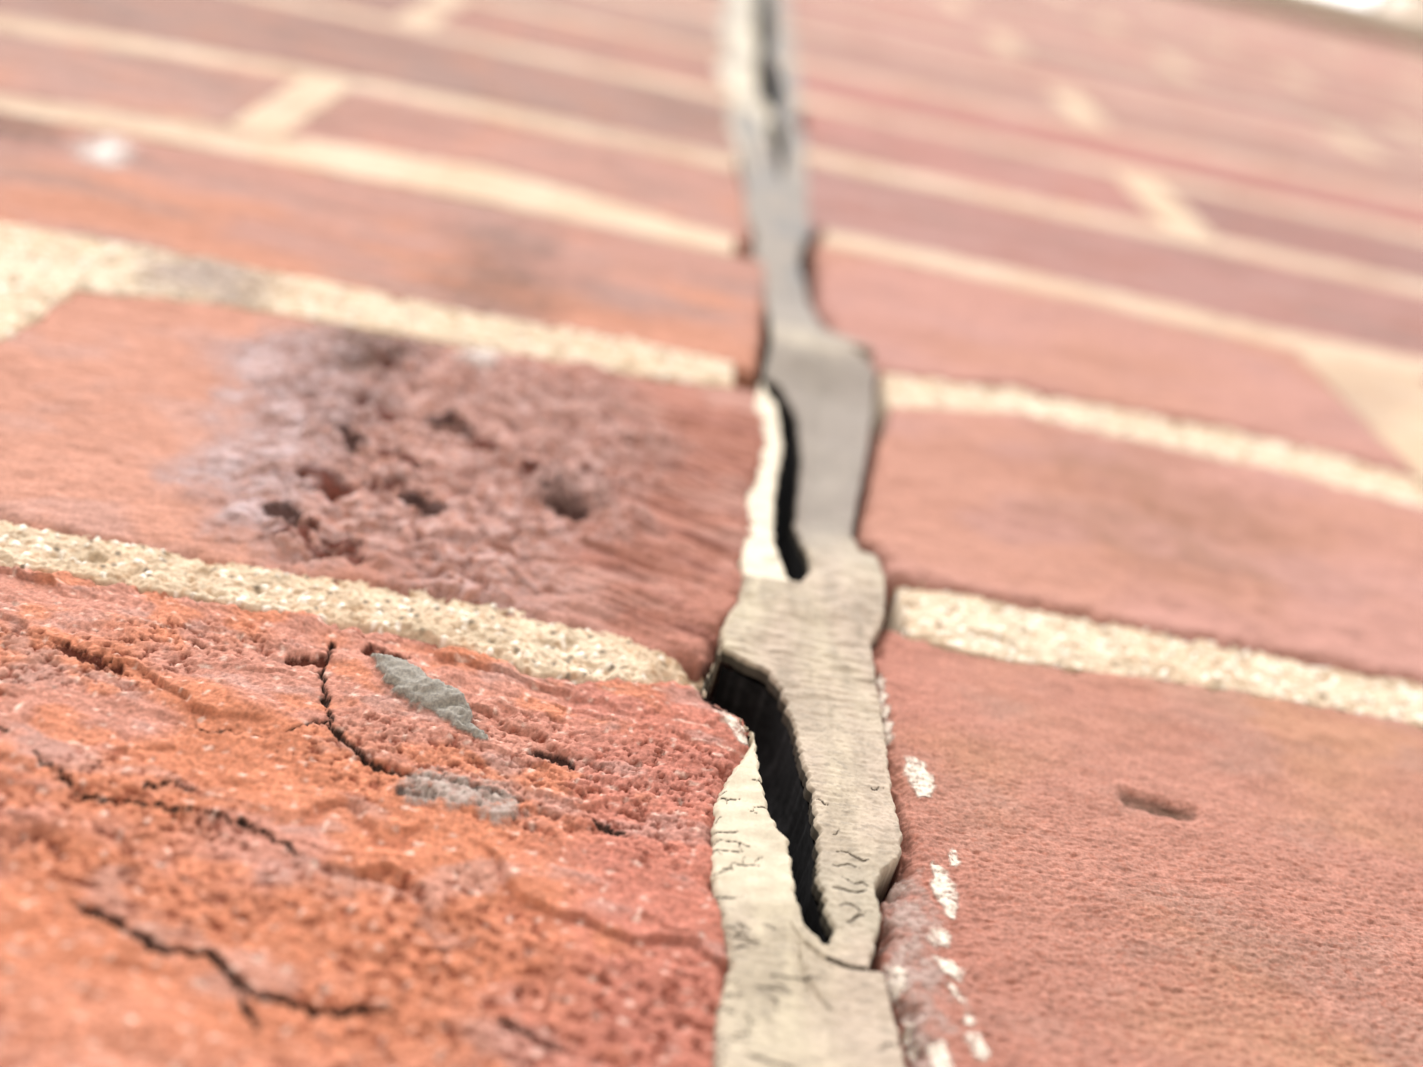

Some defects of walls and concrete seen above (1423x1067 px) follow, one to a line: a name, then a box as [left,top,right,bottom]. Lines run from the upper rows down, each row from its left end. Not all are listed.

crack [754,0,784,178]
spalling [242,335,674,614]
crack [756,376,805,582]
crack [0,727,304,857]
crack [291,643,521,804]
crack [593,820,627,838]
crack [700,662,869,1067]
crack [68,901,398,1034]
crack [498,1016,567,1053]
damp [878,880,943,1067]